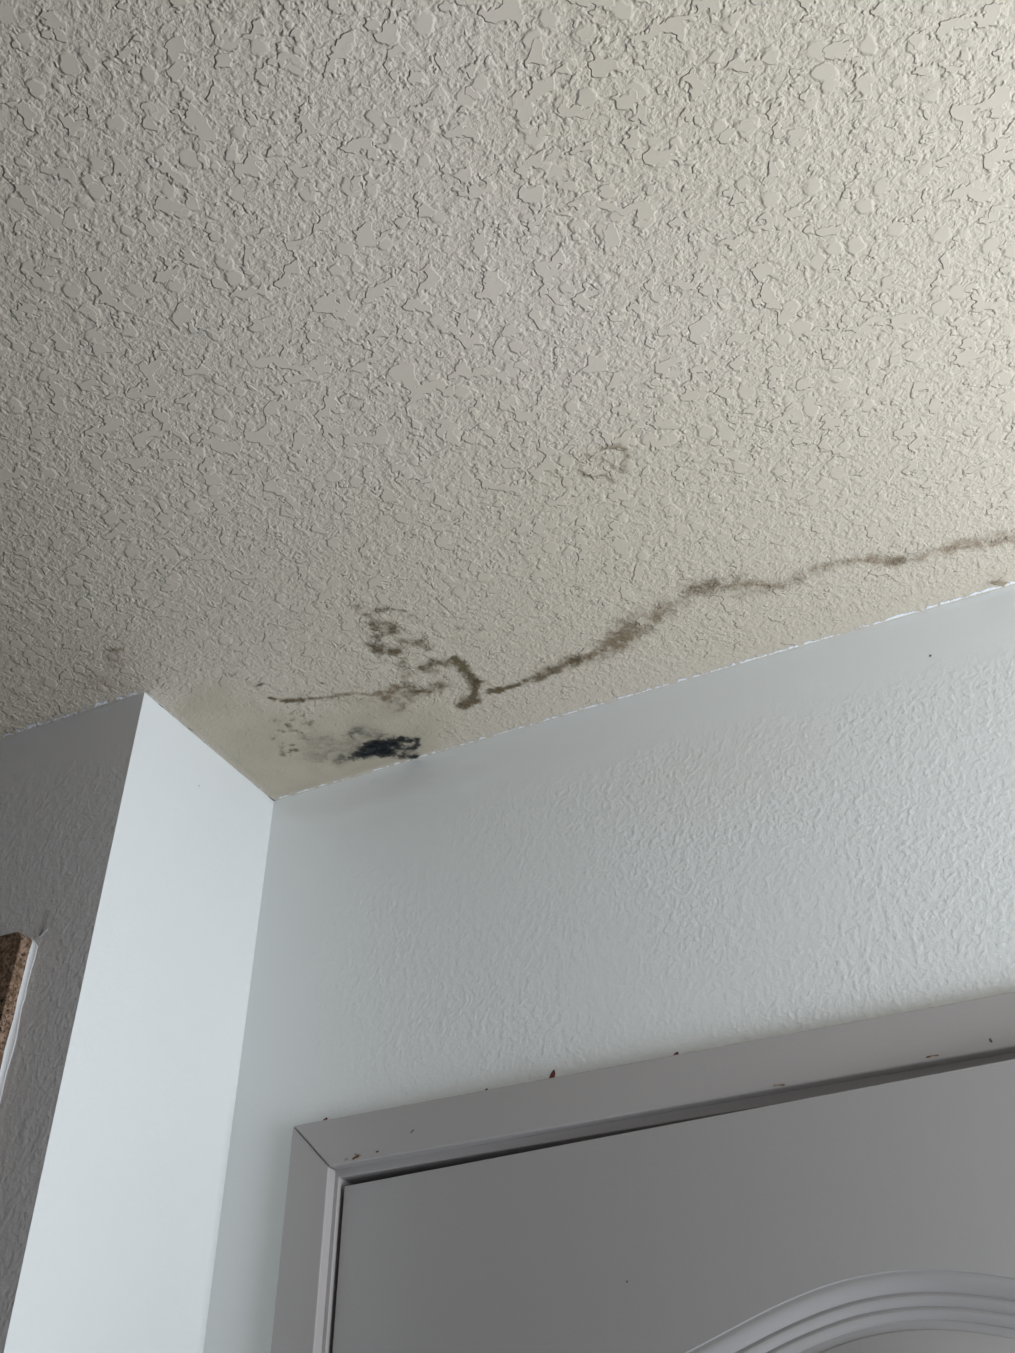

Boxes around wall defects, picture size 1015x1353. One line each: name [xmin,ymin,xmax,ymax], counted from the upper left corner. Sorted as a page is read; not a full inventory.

leakage [866,556,924,565]
leakage [257,605,664,709]
leakage [339,728,420,763]